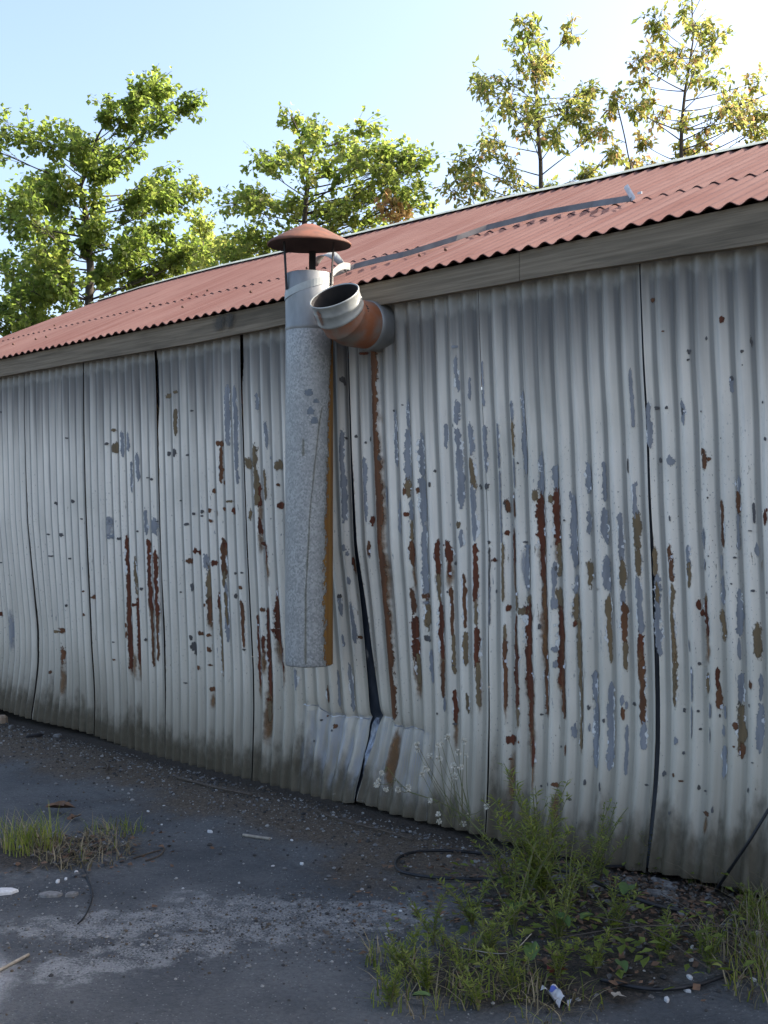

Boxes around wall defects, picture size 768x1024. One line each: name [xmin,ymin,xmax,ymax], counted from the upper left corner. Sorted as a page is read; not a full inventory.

peeling [106,516,121,540]
peeling [105,431,153,492]
corrosion [124,535,161,675]
peeling [180,538,246,670]
corrosion [256,589,284,737]
corrosion [359,351,398,720]
water stain [0,687,768,896]
peeling [383,400,436,683]
corrosion [433,539,459,744]
corrosion [506,590,559,819]
corrosion [550,587,566,719]
peeling [444,345,767,775]